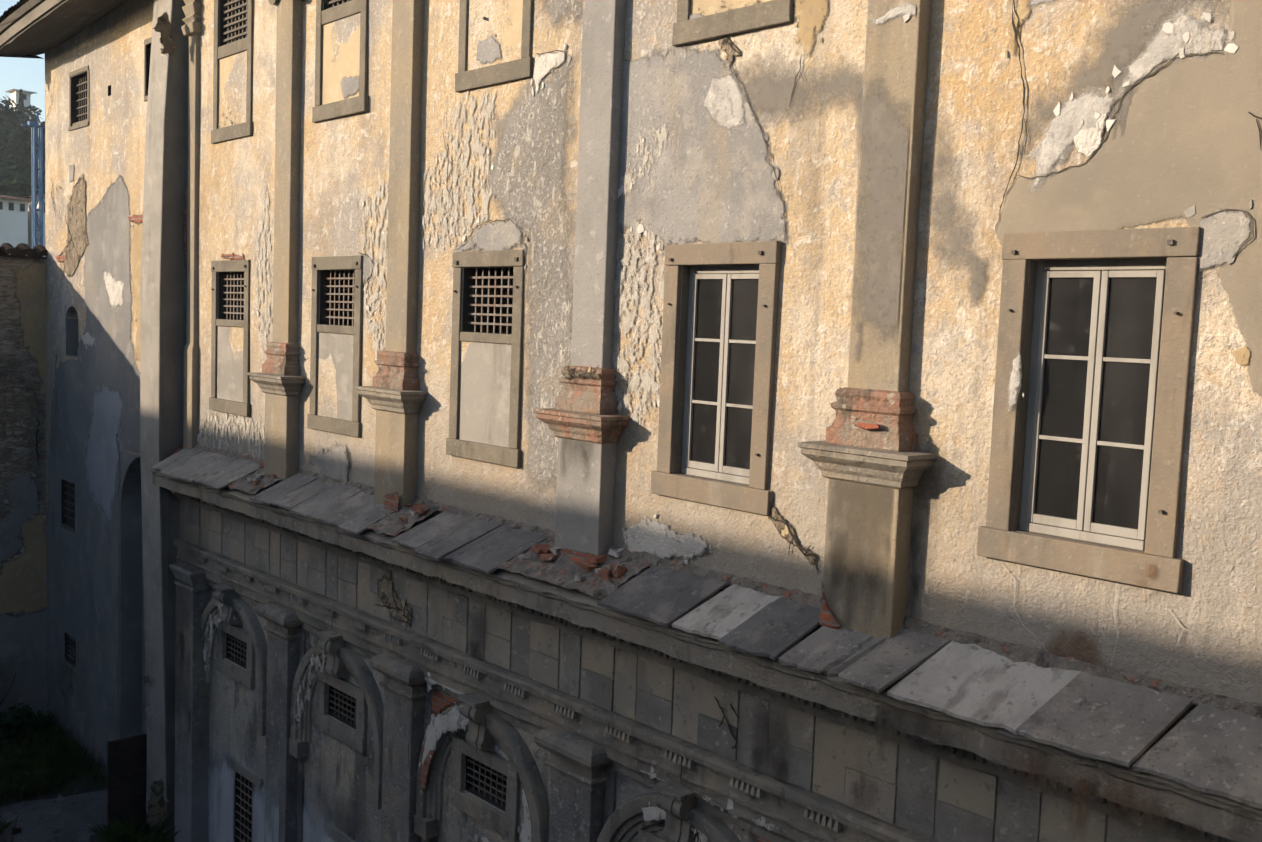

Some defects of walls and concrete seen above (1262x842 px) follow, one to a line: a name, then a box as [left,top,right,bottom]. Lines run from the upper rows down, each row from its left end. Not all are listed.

flaking render [55,164,127,277]
peeling [103,204,143,361]
peeling [419,90,519,255]
peeling [618,123,677,206]
peeling [703,36,786,240]
damp [932,140,985,302]
crack [1000,0,1028,208]
peeling [995,9,1239,230]
peeling [621,513,711,564]
crack [771,516,821,573]
peeling [418,672,469,789]
crack [714,696,739,749]